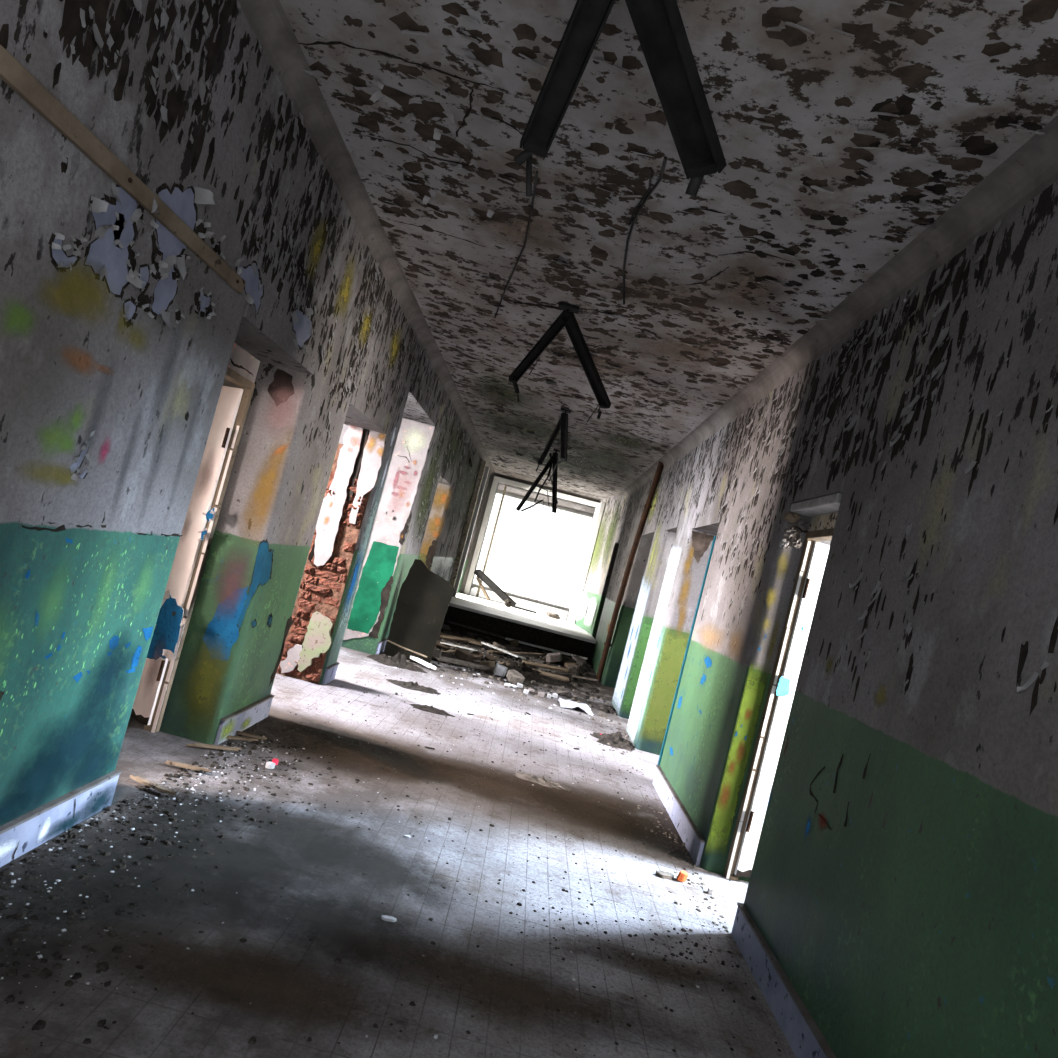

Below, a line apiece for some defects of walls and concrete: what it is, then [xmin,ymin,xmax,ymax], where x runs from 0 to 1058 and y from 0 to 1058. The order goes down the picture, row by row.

peeling [832,23,880,47]
peeling [884,0,926,18]
peeling [981,32,1011,64]
peeling [1022,0,1058,23]
peeling [821,51,931,182]
peeling [883,116,1045,252]
flaking render [22,0,866,688]
flaking render [606,220,1001,643]
peeling [963,318,1032,496]
peeling [776,676,791,697]
peeling [807,500,936,702]
peeling [1016,616,1058,715]